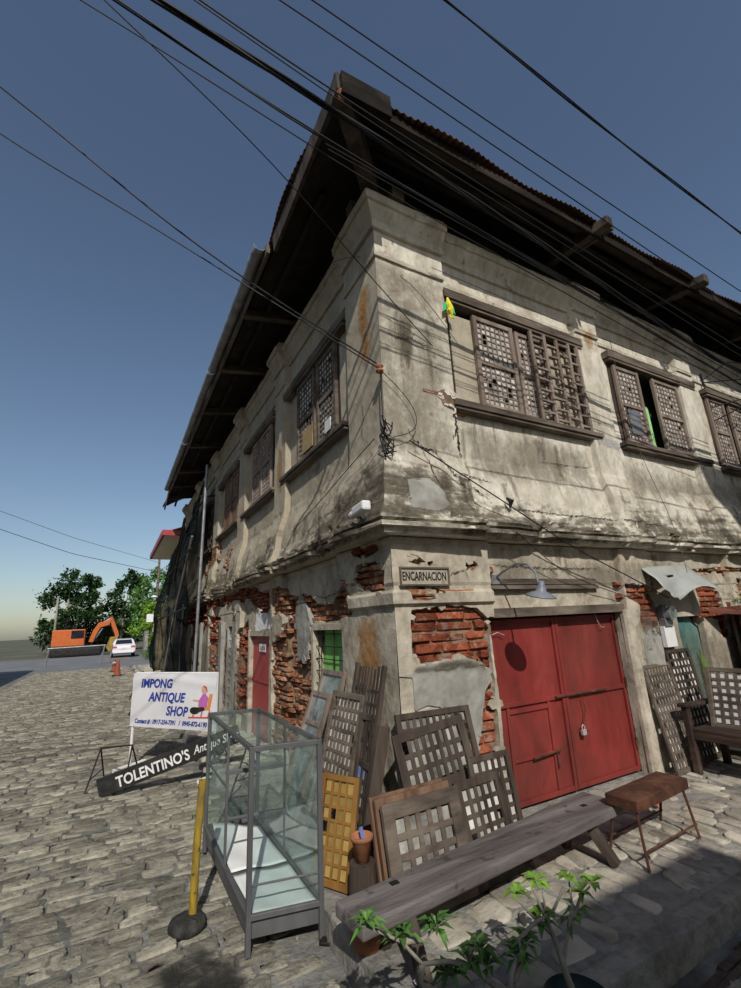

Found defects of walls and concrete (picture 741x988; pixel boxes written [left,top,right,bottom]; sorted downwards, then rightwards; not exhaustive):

damp [201,462,625,599]
damp [634,509,741,549]
flaking render [187,539,385,754]
flaking render [405,586,505,755]
flaking render [692,567,741,637]